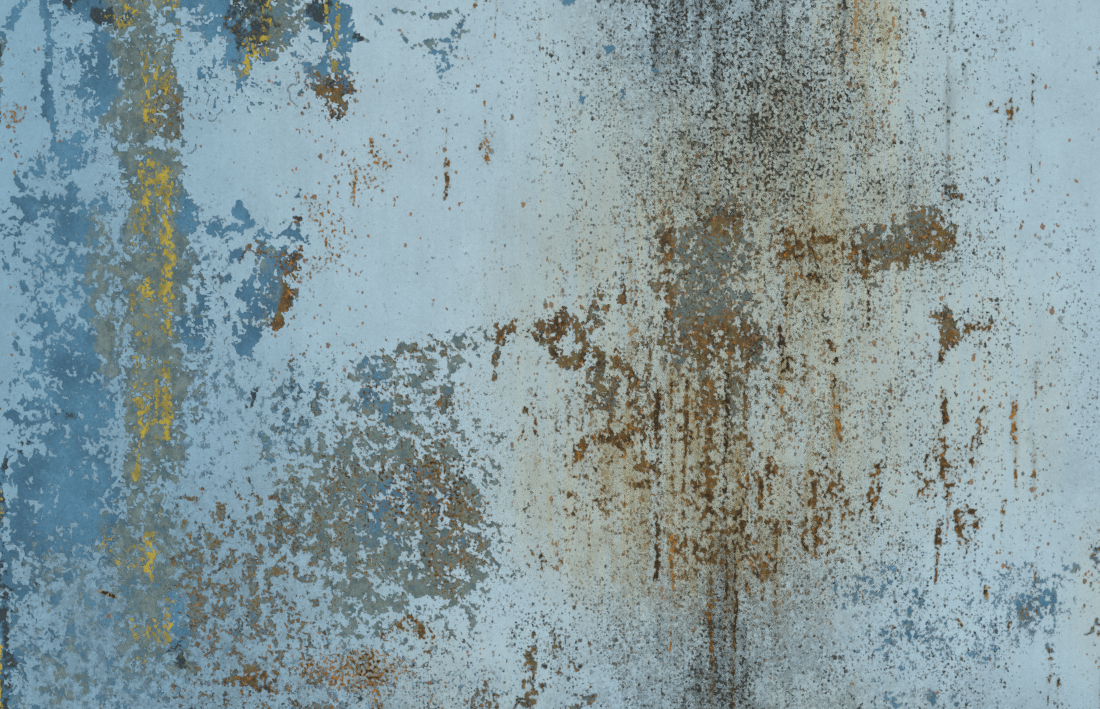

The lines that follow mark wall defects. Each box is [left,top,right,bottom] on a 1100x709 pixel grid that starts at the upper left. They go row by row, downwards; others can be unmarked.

peeling [0,0,837,709]
leakage [614,0,928,348]
peeling [831,203,959,292]
peeling [931,305,965,351]
peeling [942,184,964,207]
corrosion [959,311,993,341]
corrosion [253,184,966,709]
corrosion [909,389,990,585]
leakage [624,534,815,709]